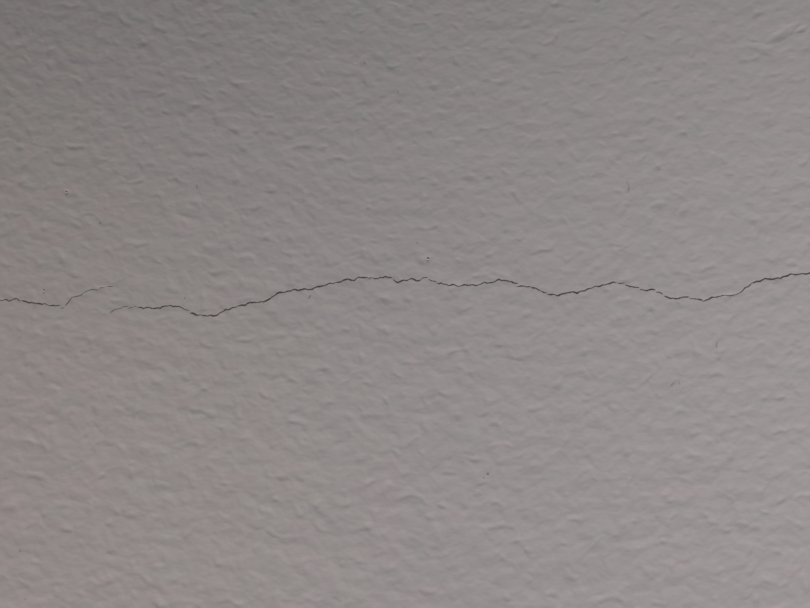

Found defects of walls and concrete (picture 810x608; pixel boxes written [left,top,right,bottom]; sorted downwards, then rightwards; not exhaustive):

crack [0,276,133,309]
crack [109,271,810,318]